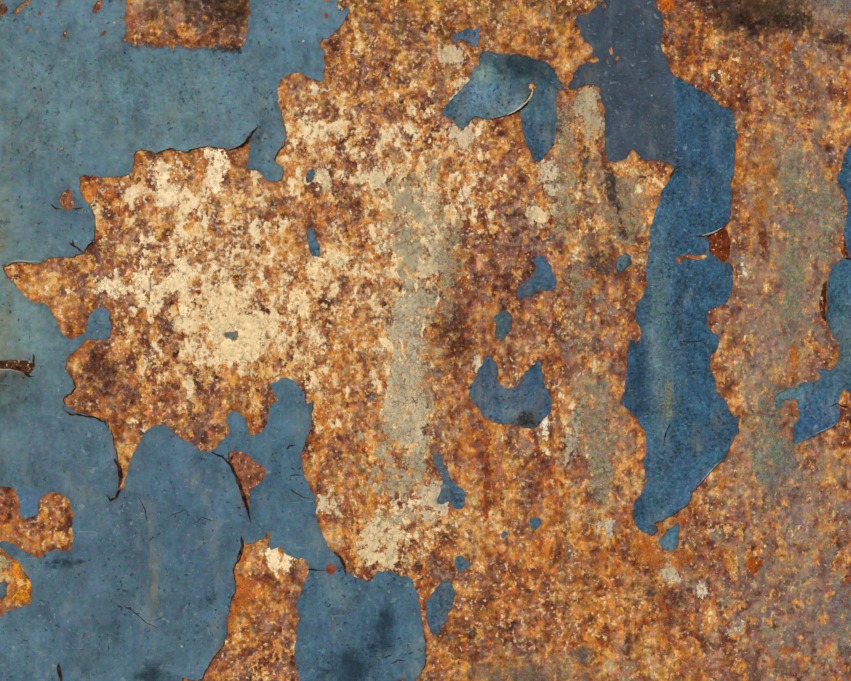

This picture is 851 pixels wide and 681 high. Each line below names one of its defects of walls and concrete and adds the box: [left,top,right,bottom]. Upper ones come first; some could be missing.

rust [60,190,74,209]
rust [707,228,730,262]
peeling [442,0,739,551]
peeling [774,144,851,444]
rust [819,281,827,321]
rust [0,360,34,374]
peeling [0,0,456,681]
rust [228,451,266,517]
peeling [434,454,466,509]
rust [482,432,505,520]
rust [12,561,31,602]
peeling [455,556,473,573]